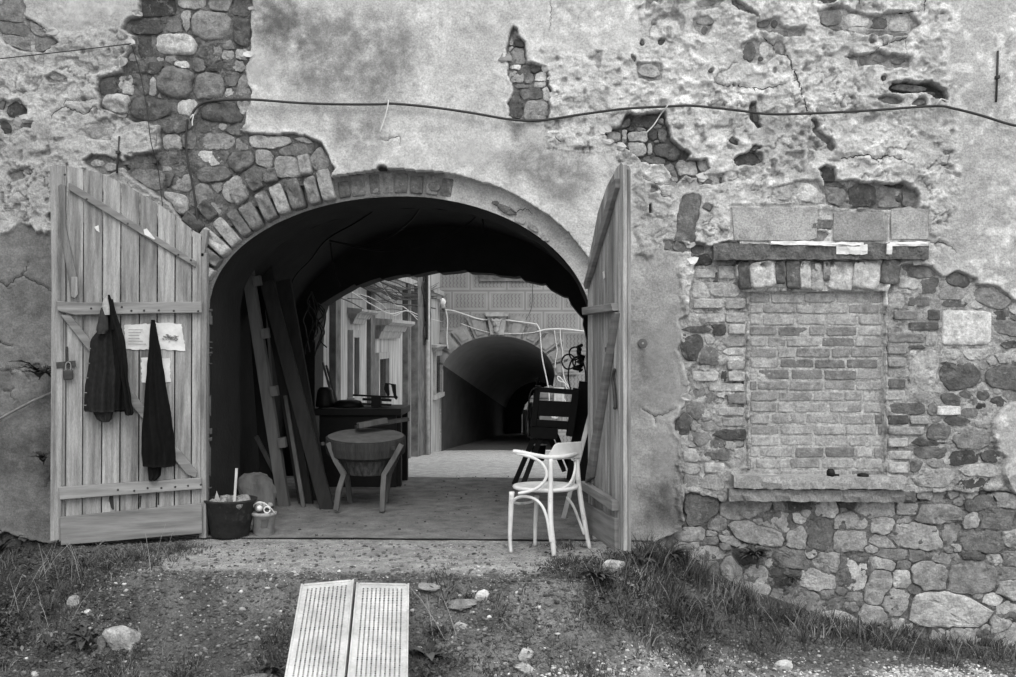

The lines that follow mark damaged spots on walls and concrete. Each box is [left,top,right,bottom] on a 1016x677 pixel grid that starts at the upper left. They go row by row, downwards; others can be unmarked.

spalling [0,0,59,52]
spalling [48,73,67,83]
spalling [498,29,558,122]
spalling [0,100,33,134]
spalling [51,0,335,243]
spalling [599,113,723,185]
spalling [749,102,760,128]
spalling [811,120,834,151]
spalling [771,166,918,210]
flaking render [663,240,749,519]
flaking render [884,259,1016,502]